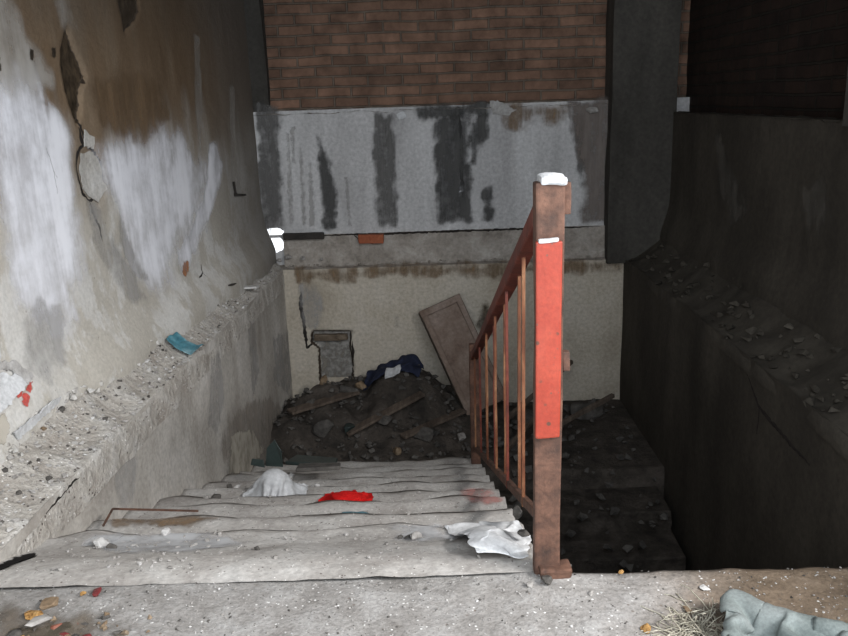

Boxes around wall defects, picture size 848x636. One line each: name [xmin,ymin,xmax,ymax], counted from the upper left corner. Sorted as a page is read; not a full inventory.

spalling [117,0,138,32]
damp [0,0,78,336]
damp [96,73,222,299]
damp [256,102,290,234]
damp [302,147,337,229]
damp [372,113,398,226]
damp [417,101,489,223]
damp [481,188,494,221]
damp [508,104,560,130]
damp [568,98,608,222]
peeling [0,360,34,444]